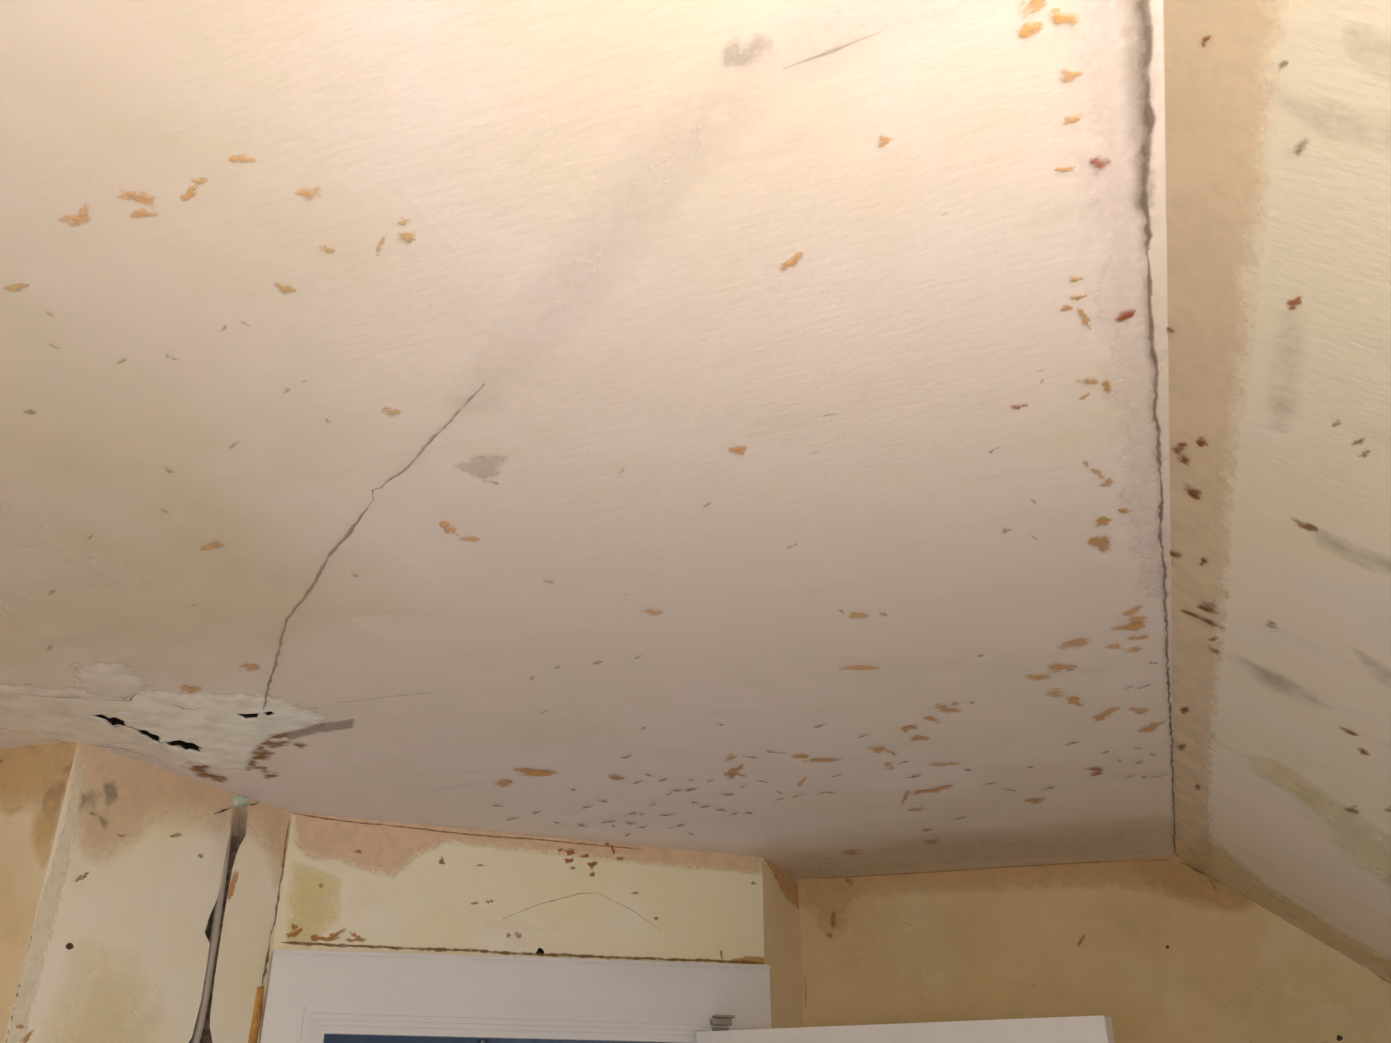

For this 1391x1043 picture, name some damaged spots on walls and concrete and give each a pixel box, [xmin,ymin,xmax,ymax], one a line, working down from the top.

crack [784,31,882,69]
crack [821,0,1219,882]
crack [263,383,485,709]
peeling [440,521,479,541]
spalling [0,663,327,782]